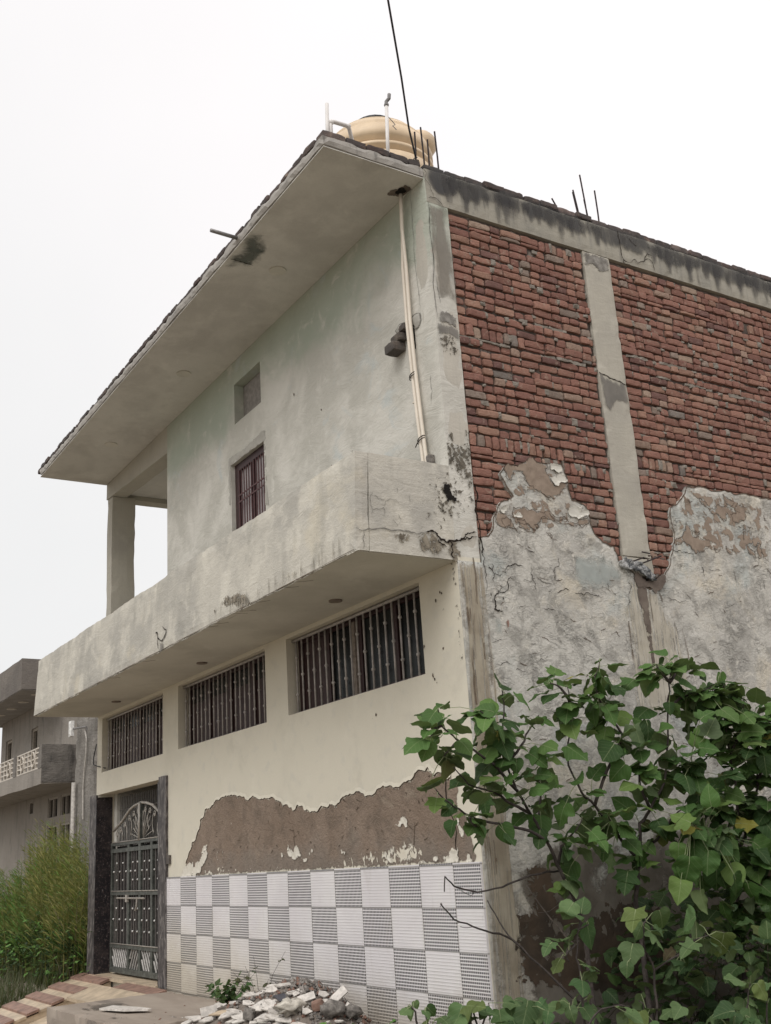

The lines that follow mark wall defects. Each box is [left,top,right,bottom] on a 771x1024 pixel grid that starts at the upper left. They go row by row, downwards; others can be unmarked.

water stain [429,168,771,298]
spalling [443,484,457,502]
crack [358,485,632,612]
flaking render [481,457,619,561]
flaking render [646,485,771,590]
peeling [181,763,476,877]